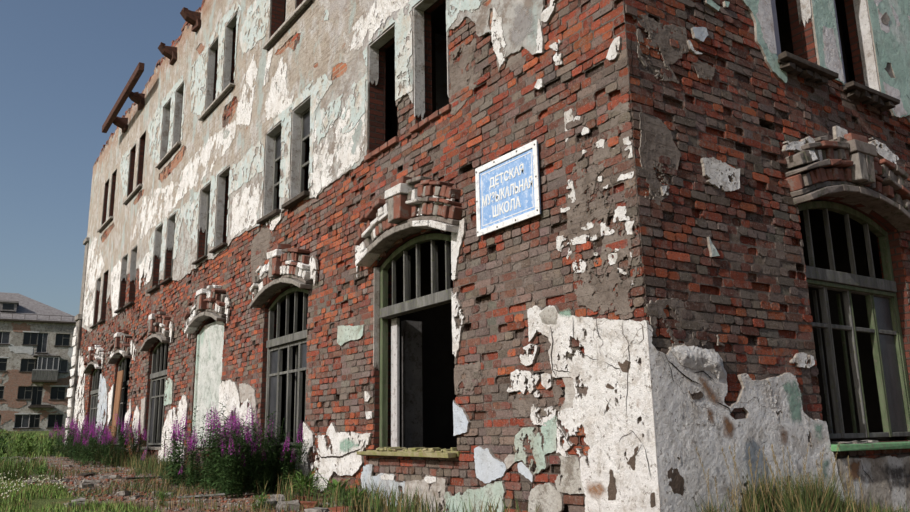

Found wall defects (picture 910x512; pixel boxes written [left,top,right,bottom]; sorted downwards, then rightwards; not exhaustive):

peeling [446,0,507,67]
peeling [536,0,564,66]
peeling [606,36,622,61]
peeling [120,0,422,295]
peeling [83,224,122,326]
peeling [295,109,910,512]
flaking render [0,347,87,435]
peeling [95,353,114,438]
peeling [158,378,189,467]
peeling [218,380,258,450]
crack [550,318,651,476]
crack [664,353,733,416]